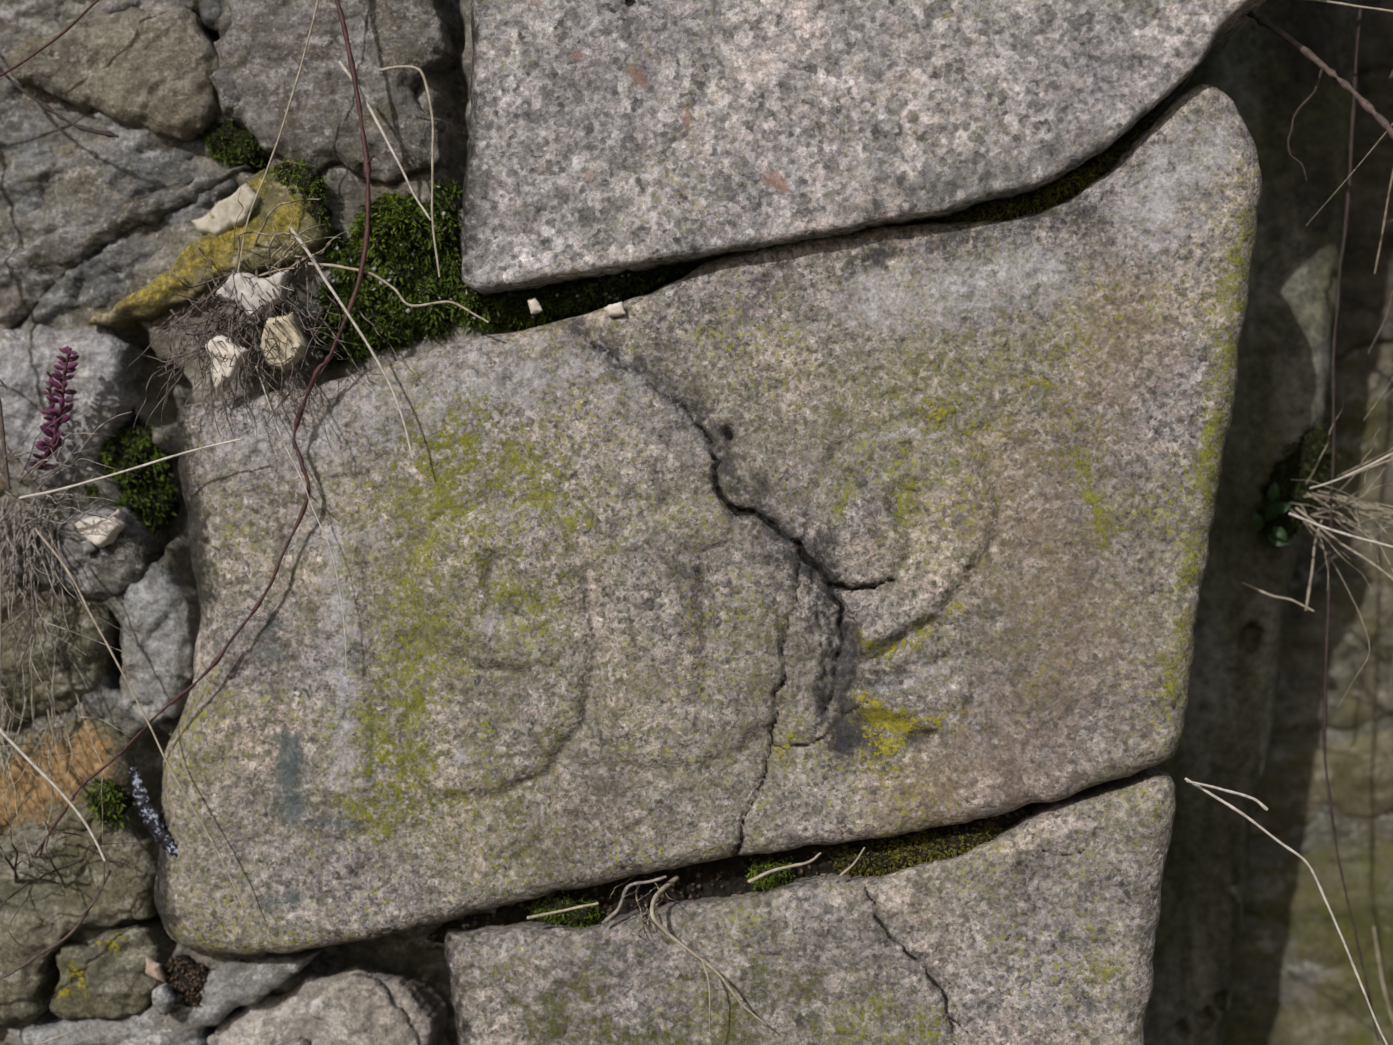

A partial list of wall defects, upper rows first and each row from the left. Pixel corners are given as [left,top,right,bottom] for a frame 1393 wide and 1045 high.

crack [589,337,913,856]
crack [864,887,961,1045]